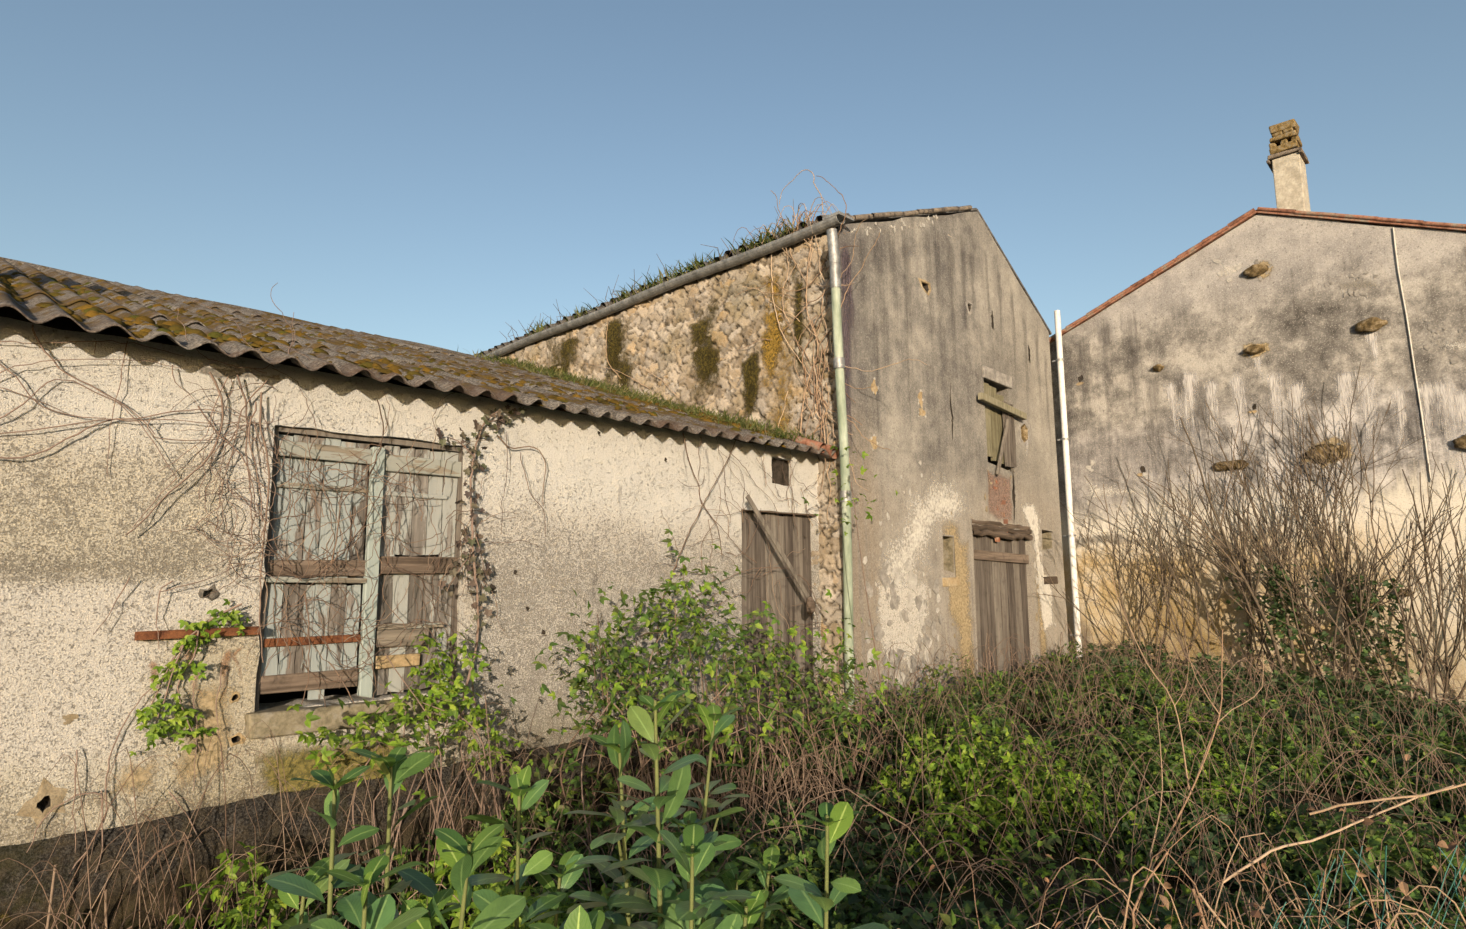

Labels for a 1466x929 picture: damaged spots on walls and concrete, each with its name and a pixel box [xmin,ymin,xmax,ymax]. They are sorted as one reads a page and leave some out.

damp [1167,373,1245,440]
damp [1253,356,1304,441]
damp [1336,373,1376,433]
damp [1393,383,1466,483]
peeling [863,461,973,689]
peeling [984,470,1056,657]
spalling [16,777,68,828]